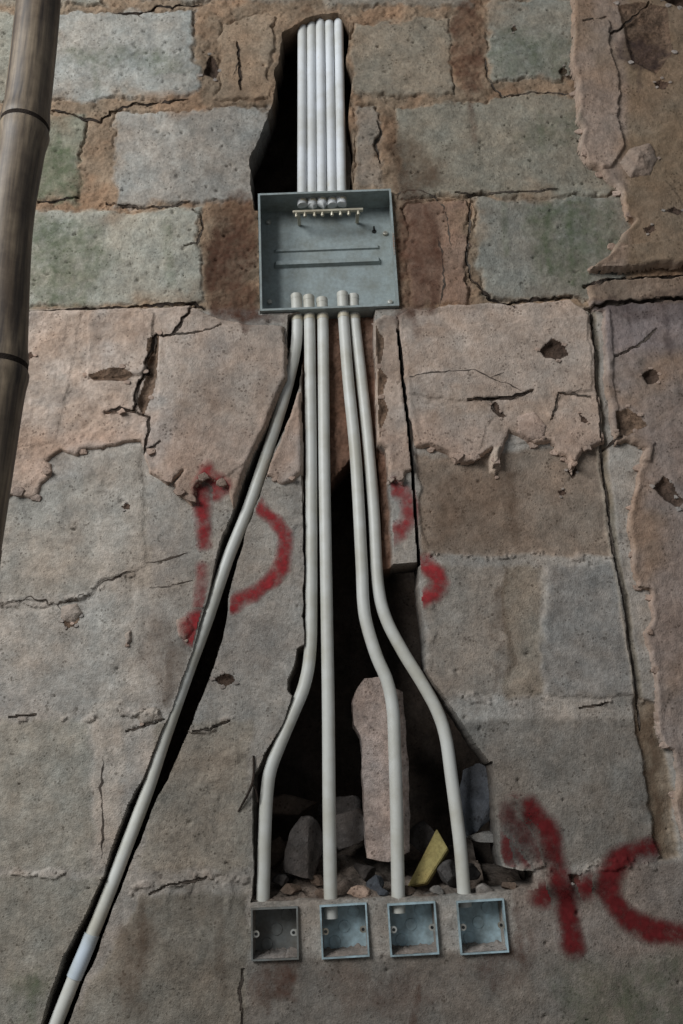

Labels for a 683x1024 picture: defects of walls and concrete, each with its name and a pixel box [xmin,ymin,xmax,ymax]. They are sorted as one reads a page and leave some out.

crack [29,301,220,454]
peeling [10,306,289,509]
peeling [265,392,304,485]
peeling [372,0,683,840]
crack [394,188,683,727]
crack [1,552,192,609]